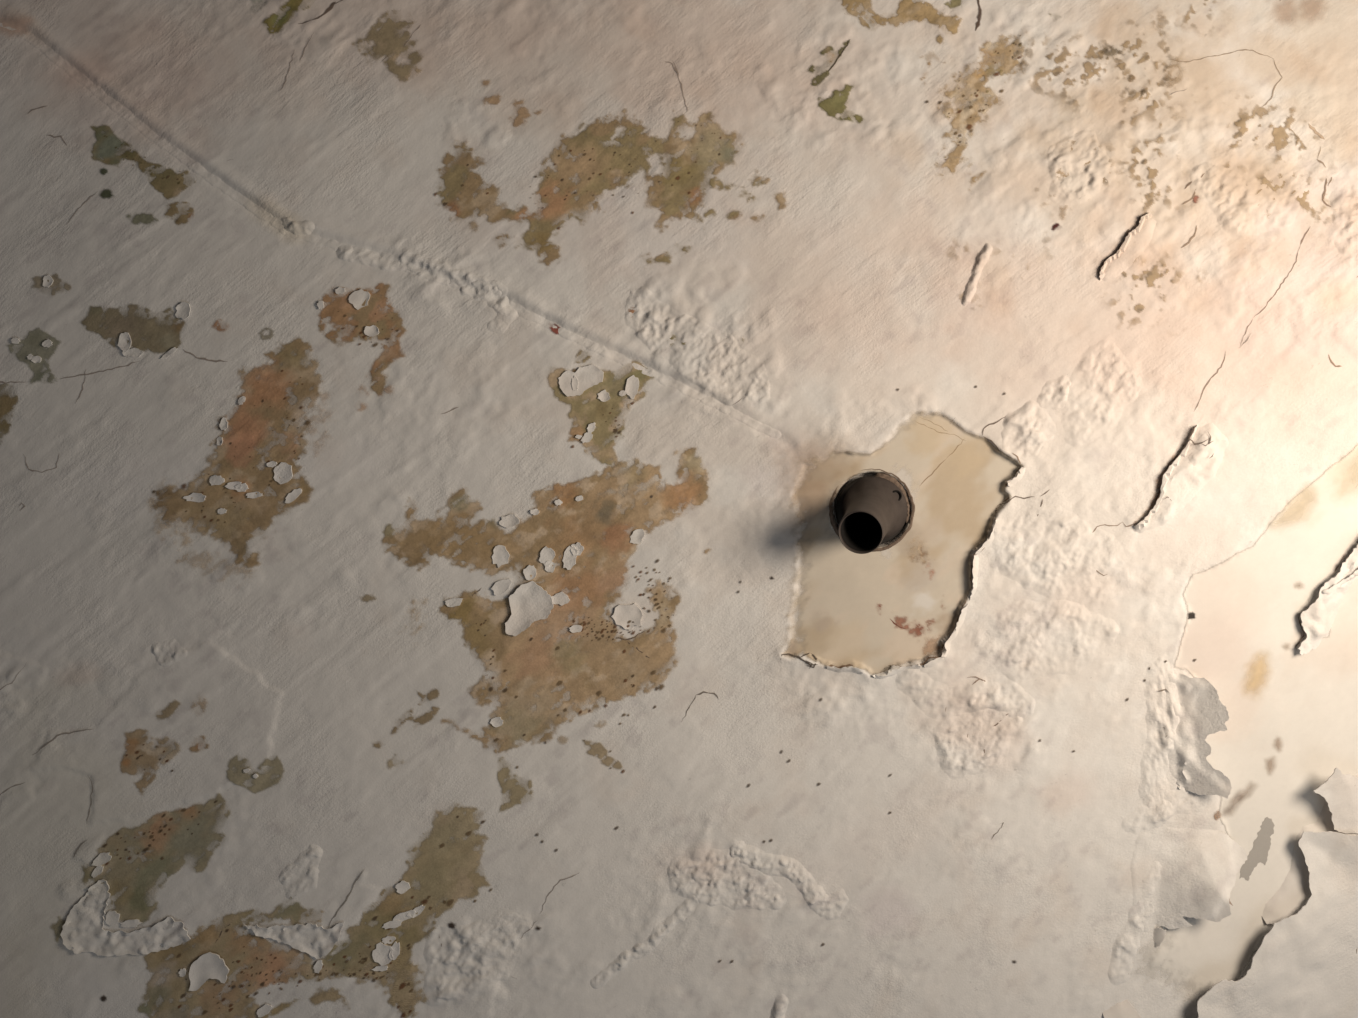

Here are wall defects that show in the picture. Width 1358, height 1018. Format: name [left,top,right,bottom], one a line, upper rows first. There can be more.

peeling [91,125,194,225]
peeling [434,110,786,266]
peeling [809,40,863,123]
peeling [842,0,961,44]
peeling [926,35,1026,172]
peeling [82,302,191,359]
peeling [317,283,406,395]
peeling [149,328,328,568]
peeling [382,351,708,811]
peeling [786,412,1025,679]
peeling [1130,445,1358,1018]
peeling [51,794,492,1018]